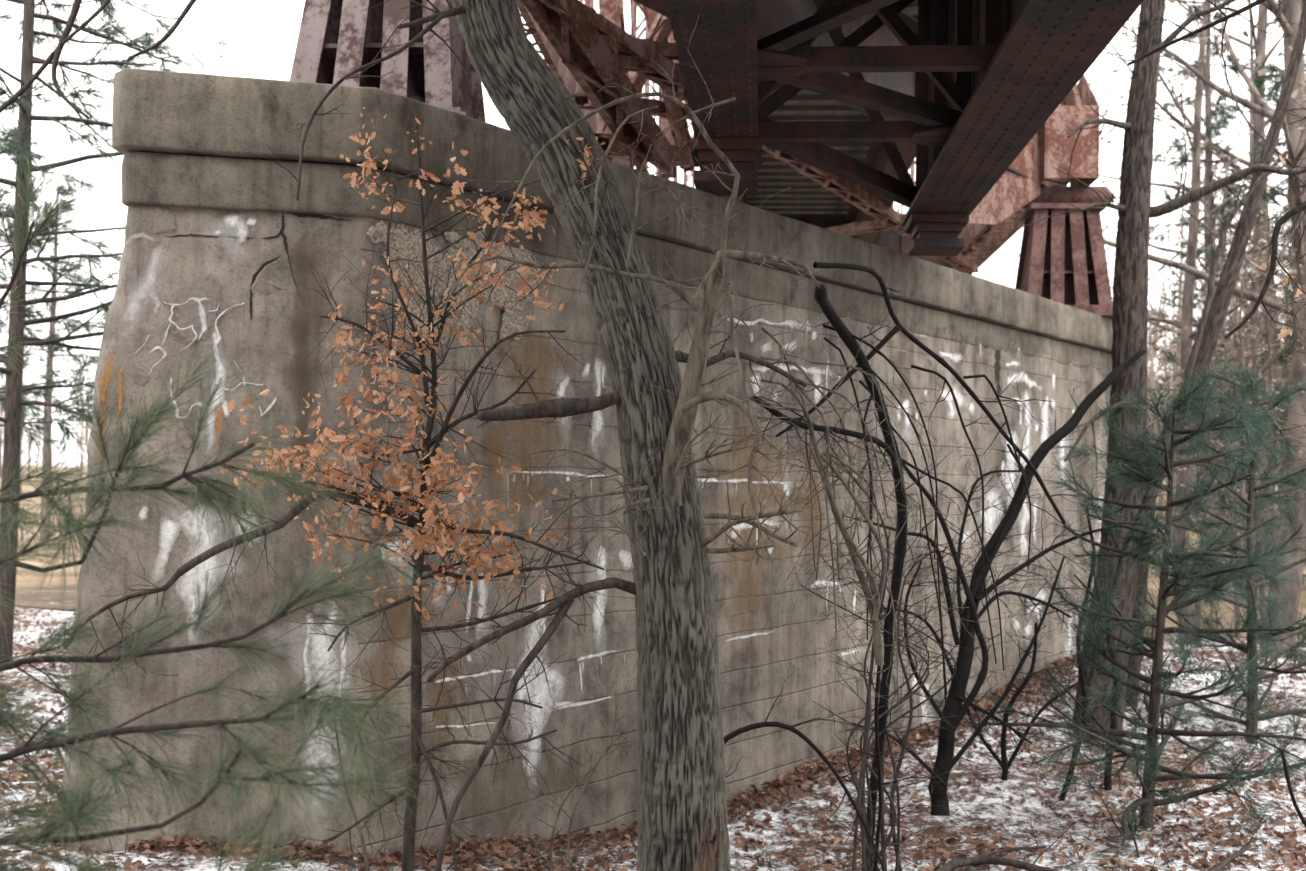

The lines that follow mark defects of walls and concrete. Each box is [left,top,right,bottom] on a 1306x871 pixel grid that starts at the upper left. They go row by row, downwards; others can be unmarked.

crack [136,212,351,418]